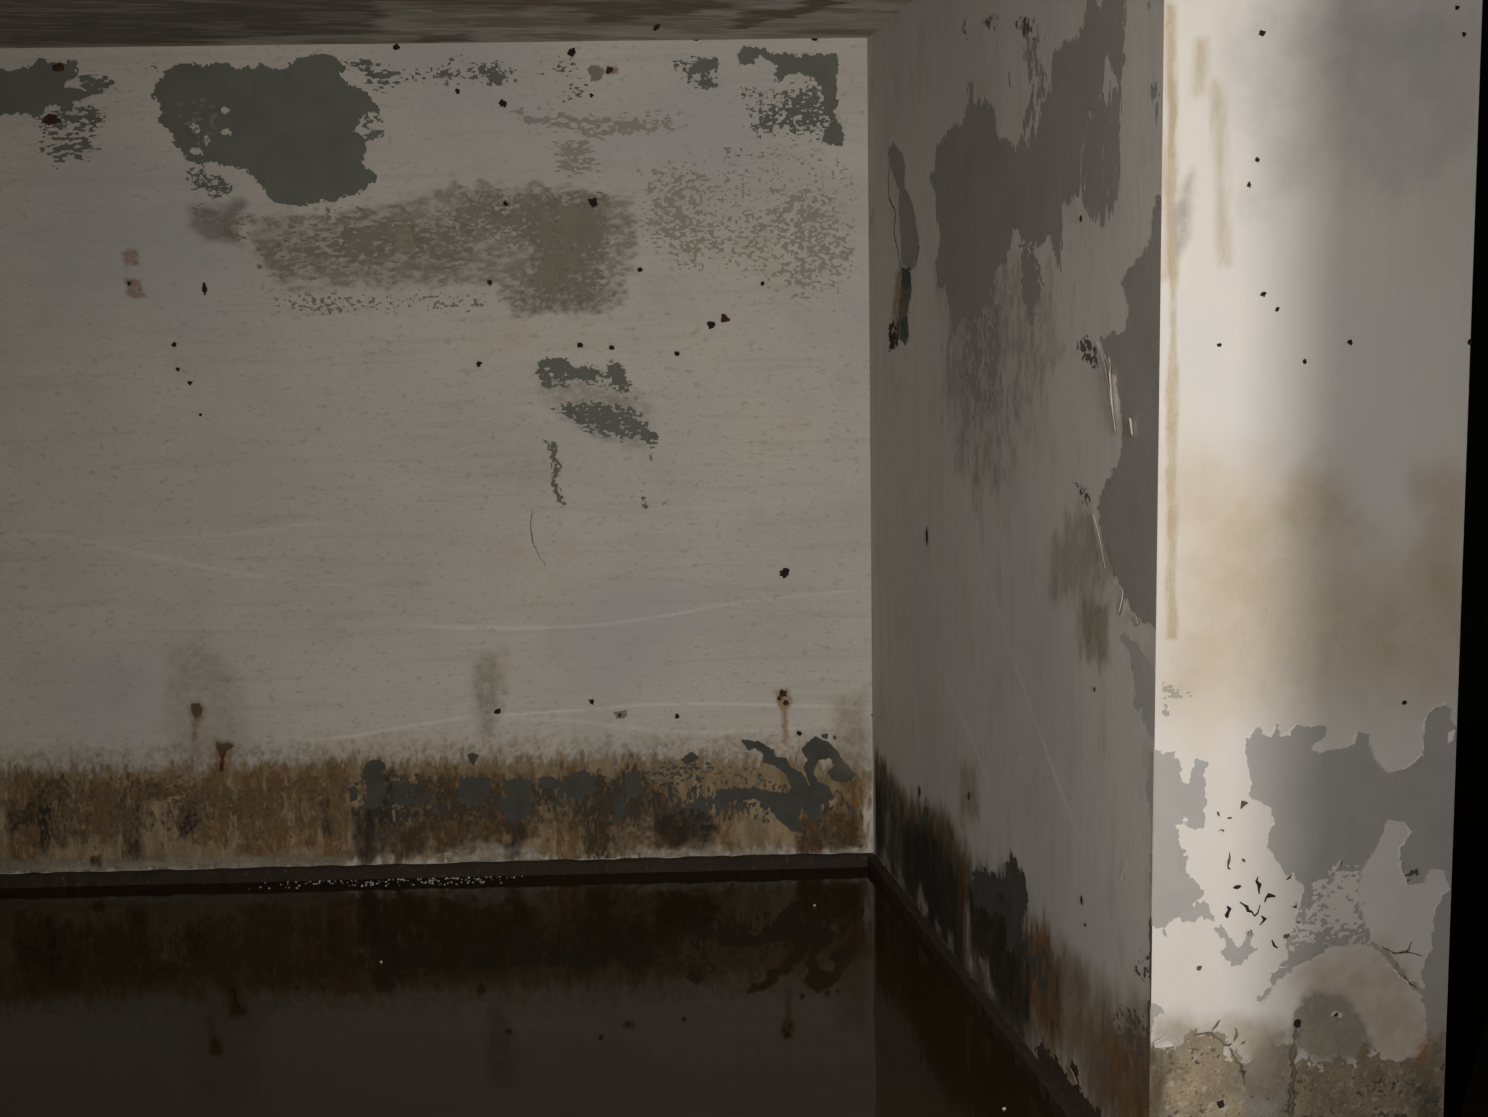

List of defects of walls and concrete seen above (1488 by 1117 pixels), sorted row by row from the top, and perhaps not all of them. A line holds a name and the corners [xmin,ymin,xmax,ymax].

peeling [0,58,117,169]
peeling [150,38,919,352]
peeling [929,0,1126,433]
peeling [535,342,659,461]
peeling [543,439,566,507]
corrosion [191,703,202,738]
corrosion [777,689,790,727]
peeling [1053,194,1457,1117]
damp [0,761,789,872]
corrosion [0,741,873,873]
damp [800,761,1033,1047]